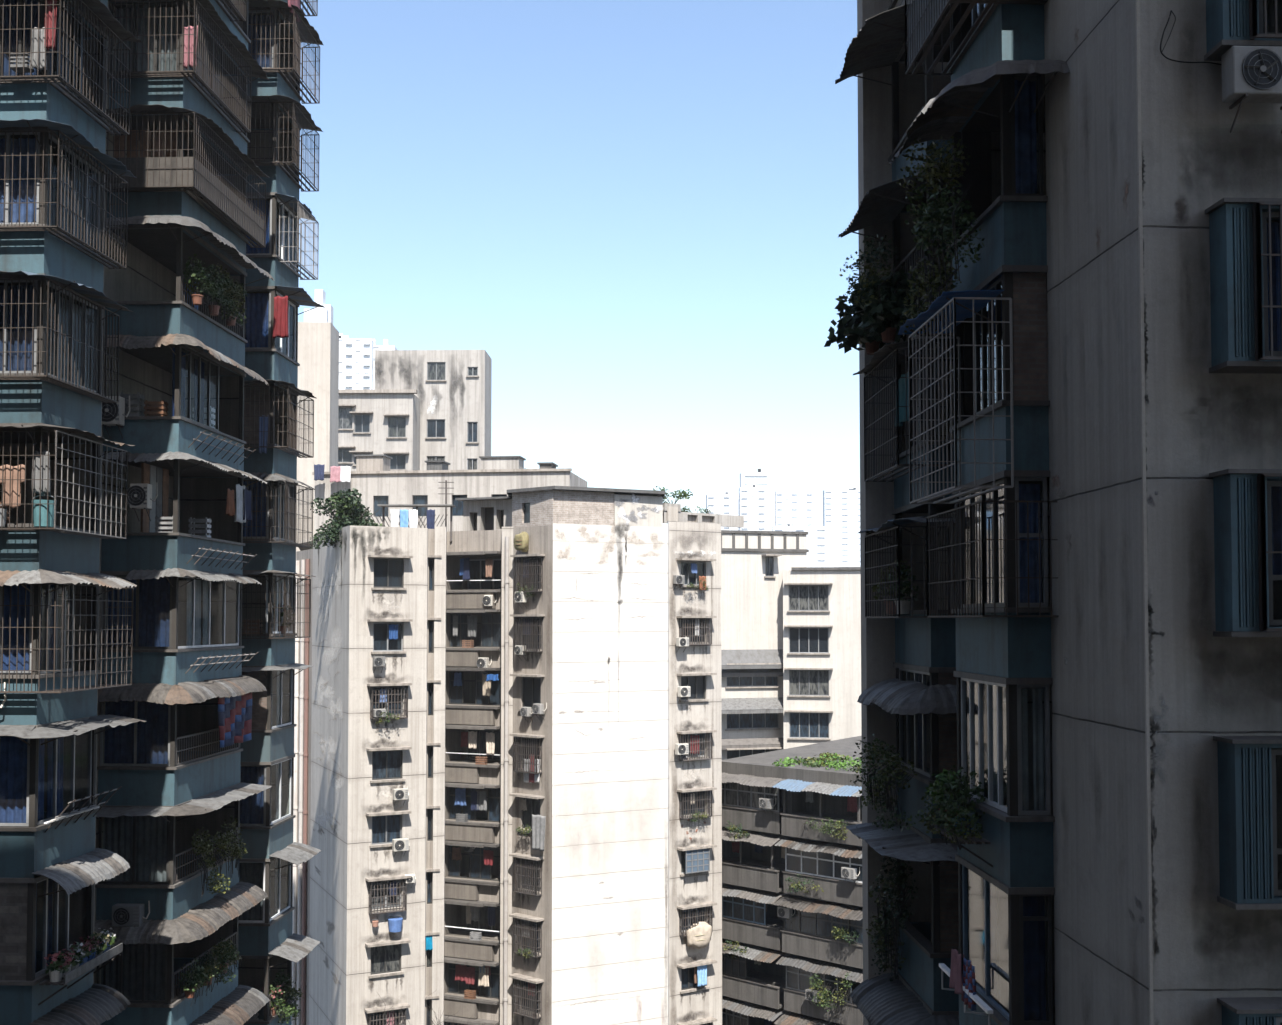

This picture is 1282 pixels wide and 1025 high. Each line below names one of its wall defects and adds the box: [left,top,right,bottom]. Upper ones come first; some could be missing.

water stain [399,364,465,414]
water stain [615,525,628,603]